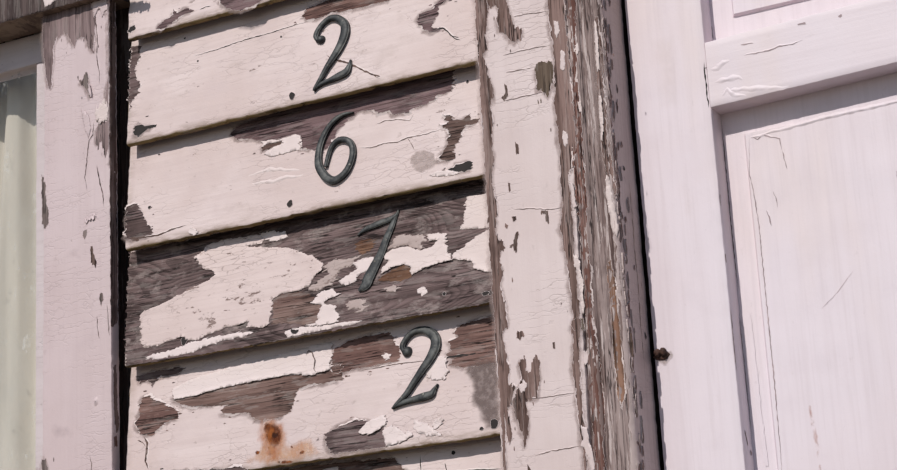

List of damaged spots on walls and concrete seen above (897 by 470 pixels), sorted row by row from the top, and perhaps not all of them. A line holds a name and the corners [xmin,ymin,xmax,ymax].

peeling [0,0,545,470]
peeling [534,0,645,470]
crack [720,129,738,284]
crack [753,134,788,169]
rust [256,424,307,463]
crack [731,315,751,444]
crack [749,173,782,470]